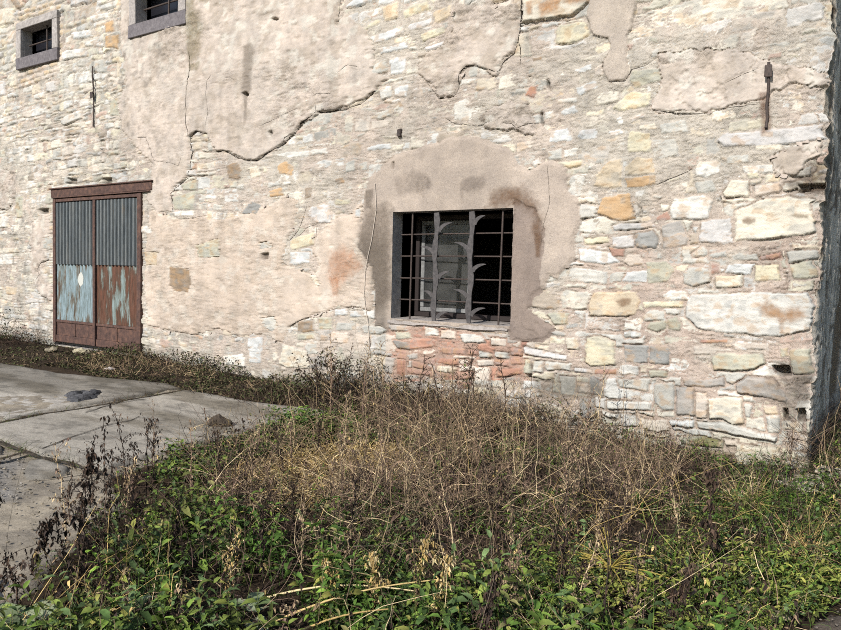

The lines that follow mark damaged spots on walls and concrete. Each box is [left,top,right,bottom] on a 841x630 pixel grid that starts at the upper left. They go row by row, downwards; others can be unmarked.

flaking render [0,0,153,351]
crack [138,51,232,210]
crack [216,91,375,161]
crack [427,0,538,128]
flaking render [134,0,837,476]